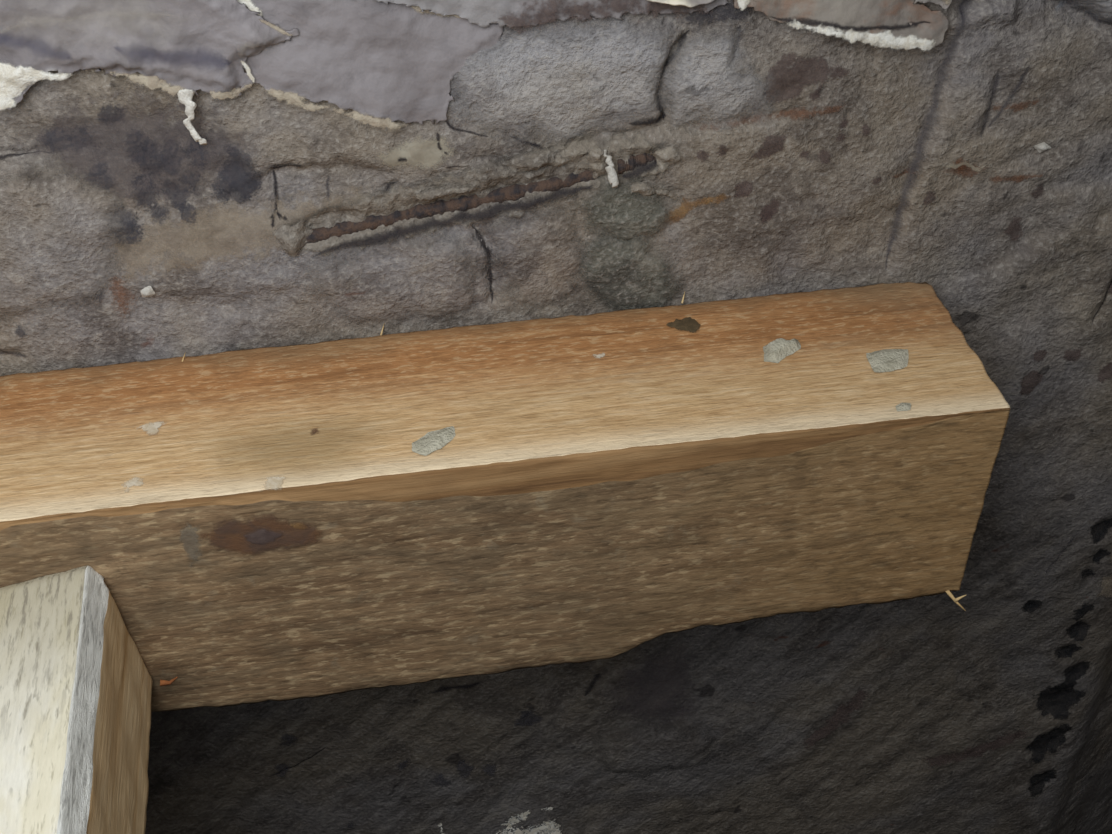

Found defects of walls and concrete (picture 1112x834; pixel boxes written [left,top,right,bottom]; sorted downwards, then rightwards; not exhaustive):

peeling [0,0,952,129]
leakage [37,104,236,198]